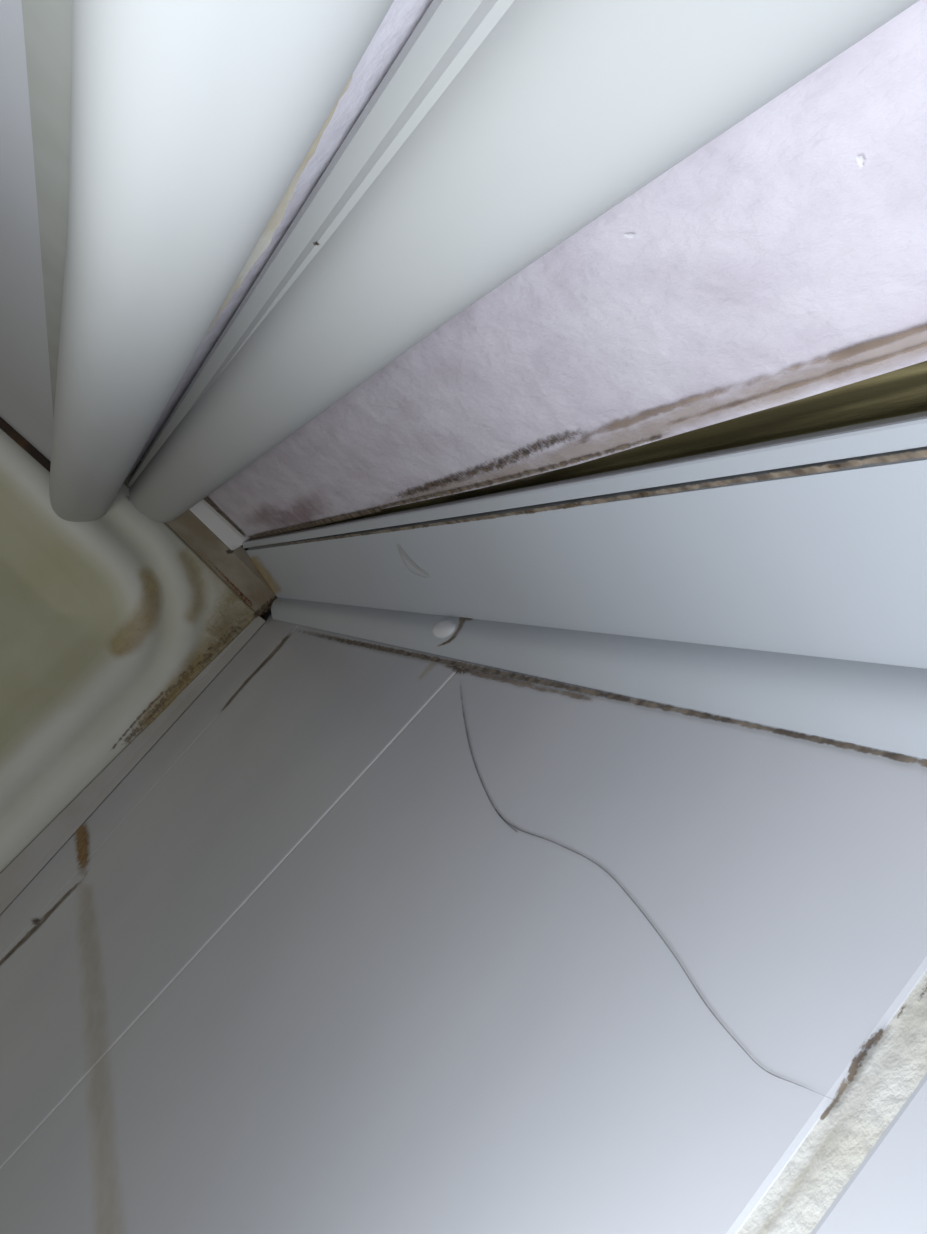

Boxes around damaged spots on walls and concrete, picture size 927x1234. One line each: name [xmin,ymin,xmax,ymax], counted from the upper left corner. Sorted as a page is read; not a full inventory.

water stain [113,325,927,767]
rust [75,825,88,868]
crack [451,666,815,1092]
water stain [820,1029,883,1120]